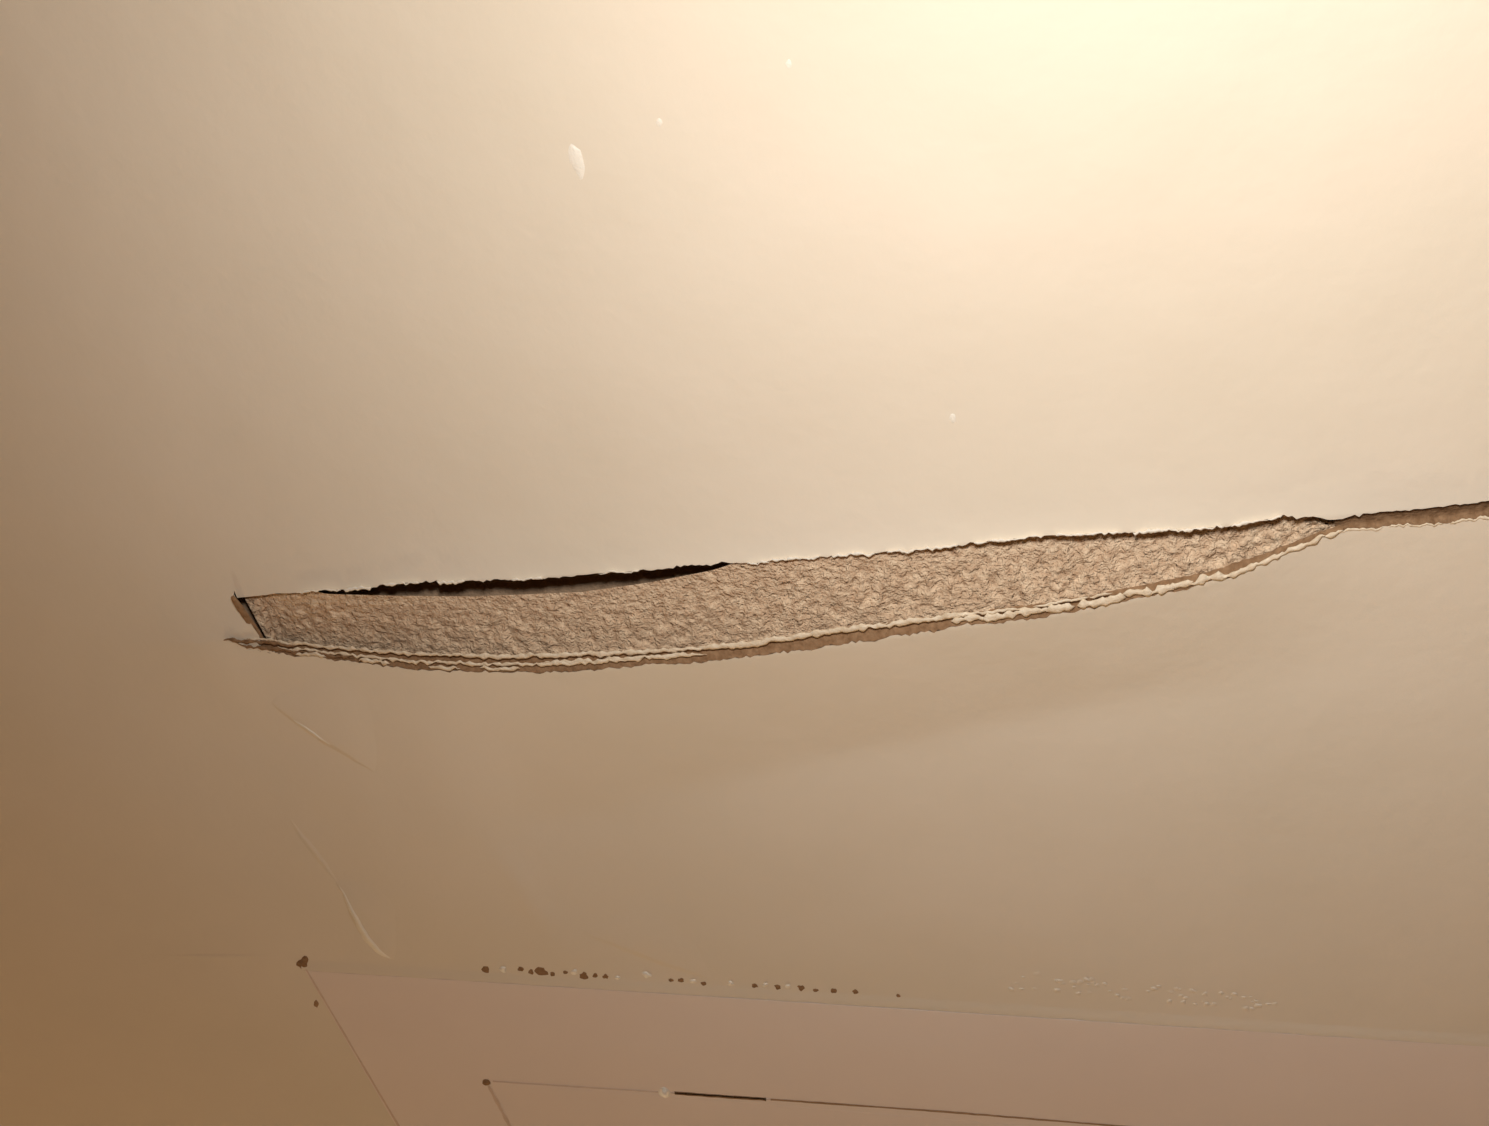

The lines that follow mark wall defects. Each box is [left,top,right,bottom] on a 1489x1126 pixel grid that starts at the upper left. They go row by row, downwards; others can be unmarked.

crack [1334,501,1489,533]